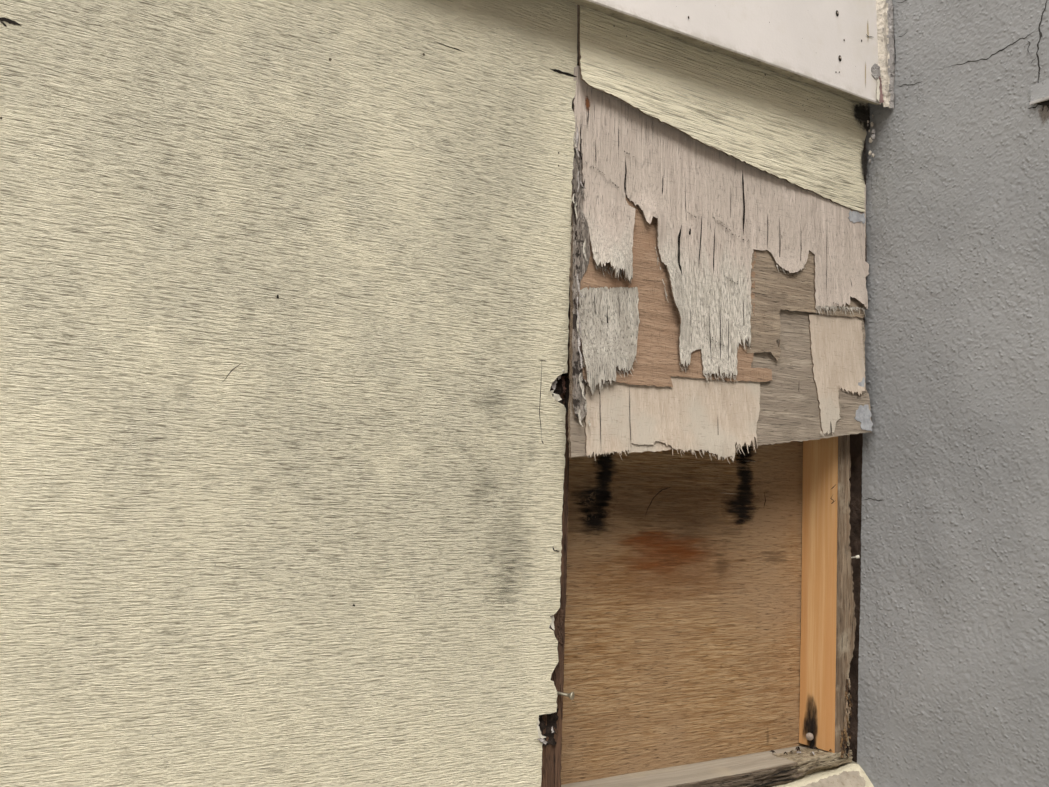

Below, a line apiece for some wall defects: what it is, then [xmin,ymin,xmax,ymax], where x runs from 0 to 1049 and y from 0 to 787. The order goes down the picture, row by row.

crack [866,32,920,103]
crack [949,1,1047,83]
peeling [578,287,640,396]
leakage [576,454,615,532]
peeling [627,442,675,453]
leakage [727,446,754,523]